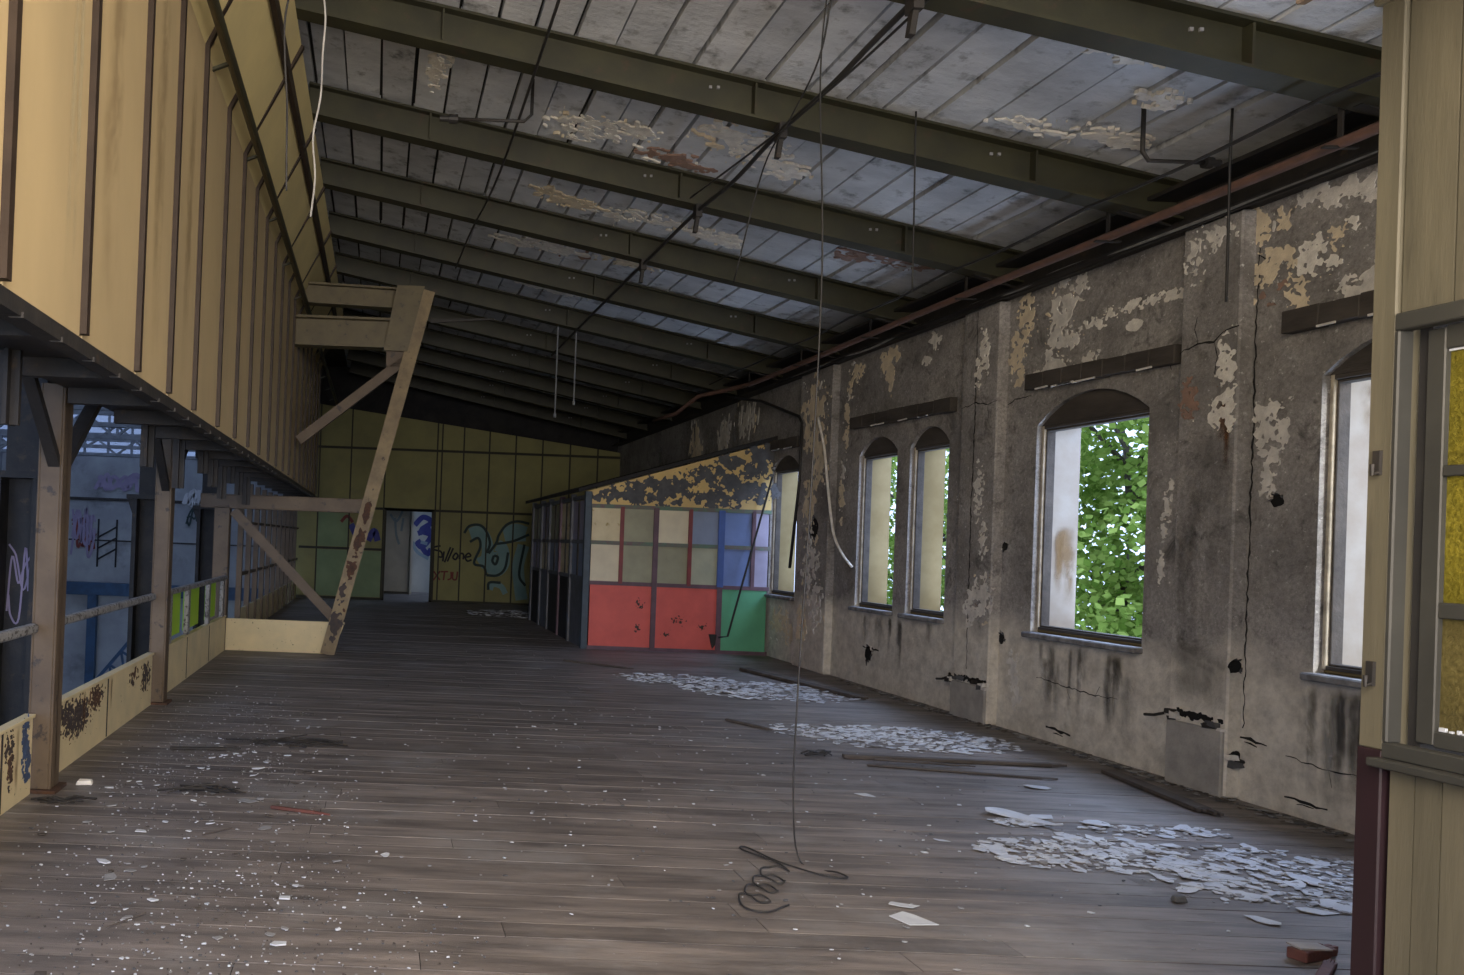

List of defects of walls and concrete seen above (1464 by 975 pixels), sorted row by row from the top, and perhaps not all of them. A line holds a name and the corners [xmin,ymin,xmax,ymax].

peeling [542,105,814,185]
peeling [983,115,1156,151]
peeling [1008,171,1378,388]
peeling [974,327,991,390]
peeling [1207,324,1292,507]
flaking render [935,672,989,691]
flaking render [1143,707,1267,769]